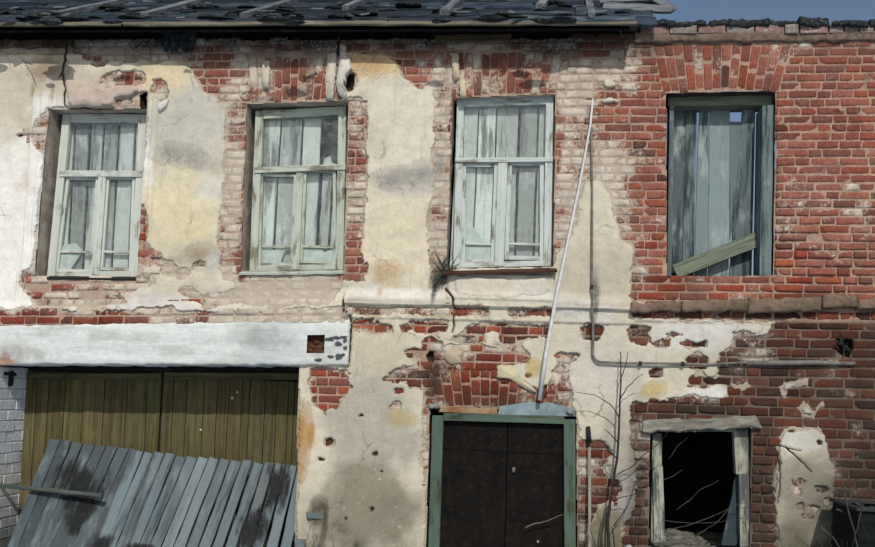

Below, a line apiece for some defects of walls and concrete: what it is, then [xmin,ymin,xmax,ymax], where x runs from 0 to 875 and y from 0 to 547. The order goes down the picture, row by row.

crack [59,40,112,110]
spalling [0,37,579,486]
crack [445,288,456,332]
spalling [580,323,609,341]
spalling [627,324,706,370]
spalling [832,339,855,357]
spalling [649,367,662,378]